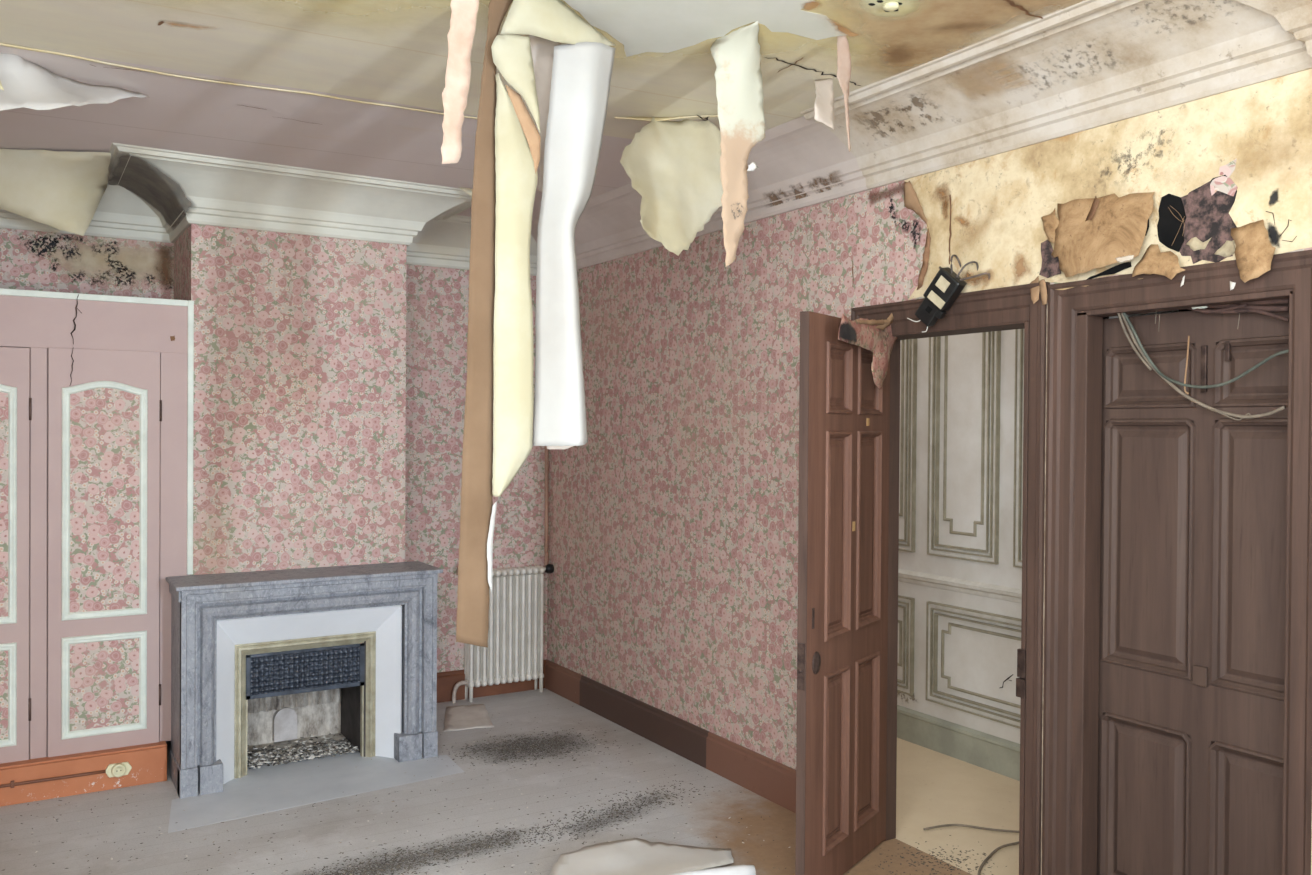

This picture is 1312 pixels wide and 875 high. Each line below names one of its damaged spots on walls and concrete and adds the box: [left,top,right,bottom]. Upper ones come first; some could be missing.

peeling [563,0,857,57]
leakage [702,22,792,44]
leakage [801,0,1080,67]
leakage [866,97,931,137]
peeling [904,69,1312,300]
leakage [17,234,172,289]
crack [70,294,80,385]
peeling [838,313,897,389]